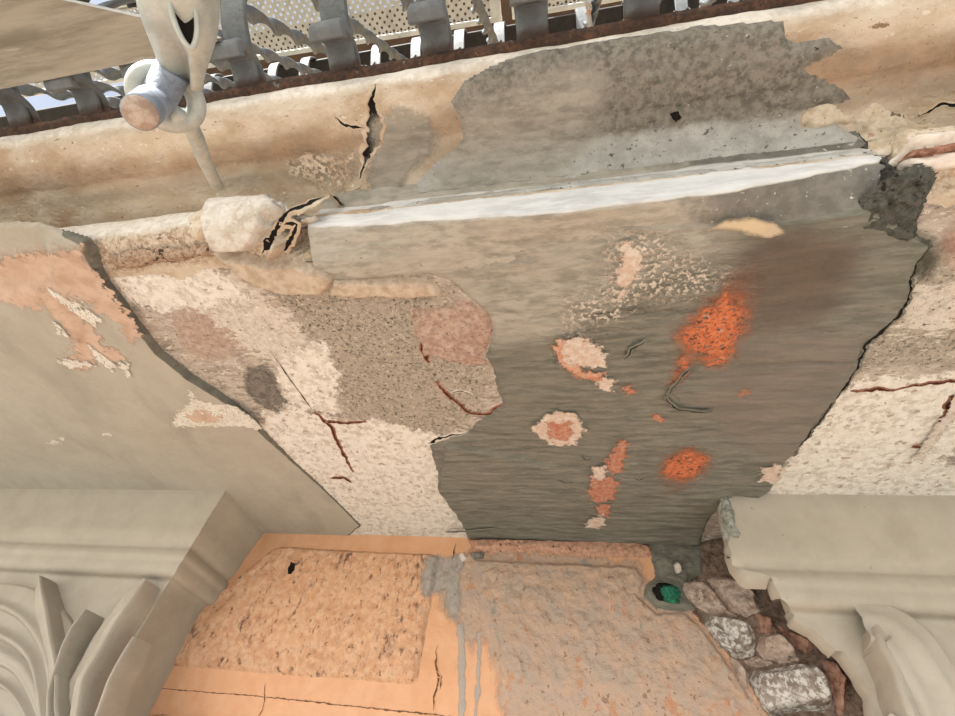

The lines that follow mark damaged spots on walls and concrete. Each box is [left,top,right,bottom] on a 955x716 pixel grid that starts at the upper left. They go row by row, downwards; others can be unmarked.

spalling [285,152,356,189]
crack [260,84,388,255]
spalling [802,103,955,173]
peeling [0,240,144,378]
peeling [171,389,261,430]
spalling [110,194,493,366]
crack [269,349,366,483]
crack [427,380,502,444]
peeling [559,232,731,329]
crack [792,243,955,457]
damp [421,549,765,716]
spalling [467,497,864,716]